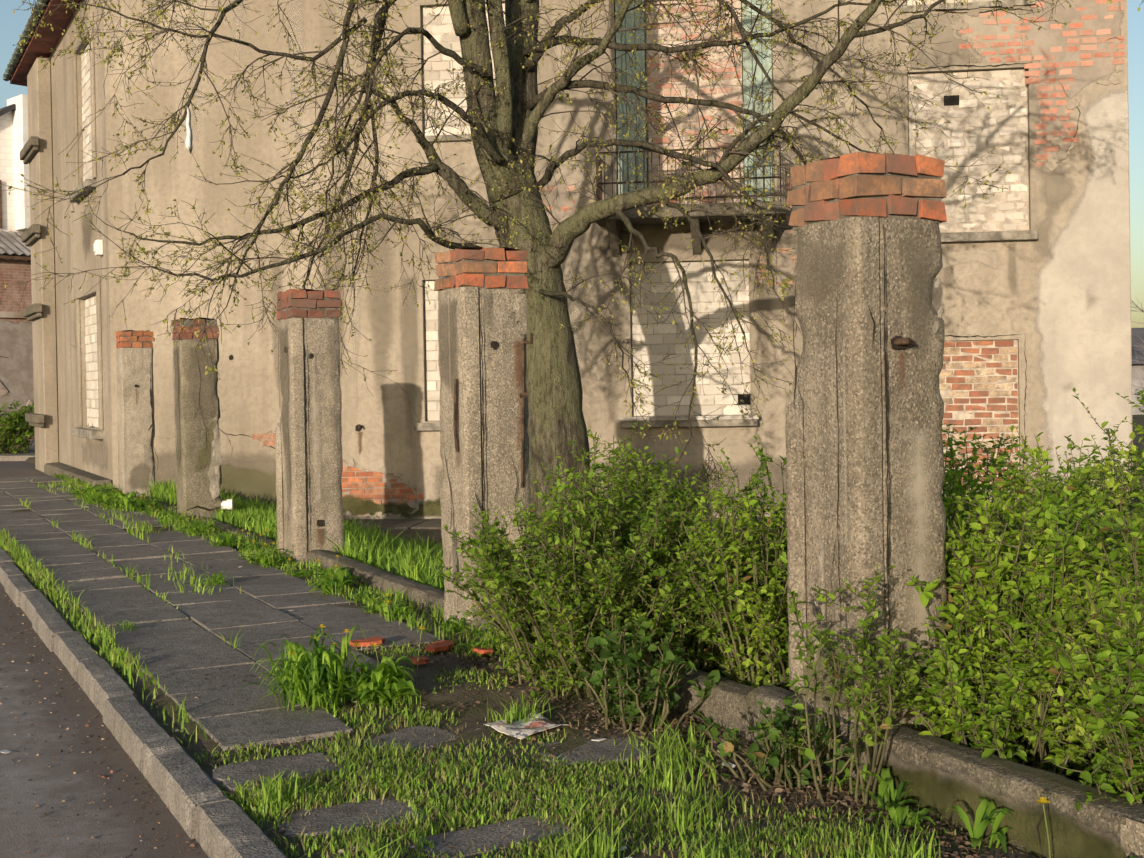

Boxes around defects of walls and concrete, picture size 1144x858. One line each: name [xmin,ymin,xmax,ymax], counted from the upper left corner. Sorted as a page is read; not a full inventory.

flaking render [950,0,1124,171]
flaking render [0,320,34,417]
crack [148,362,175,479]
spalling [341,453,423,519]
crack [831,309,841,626]
crack [868,225,891,657]